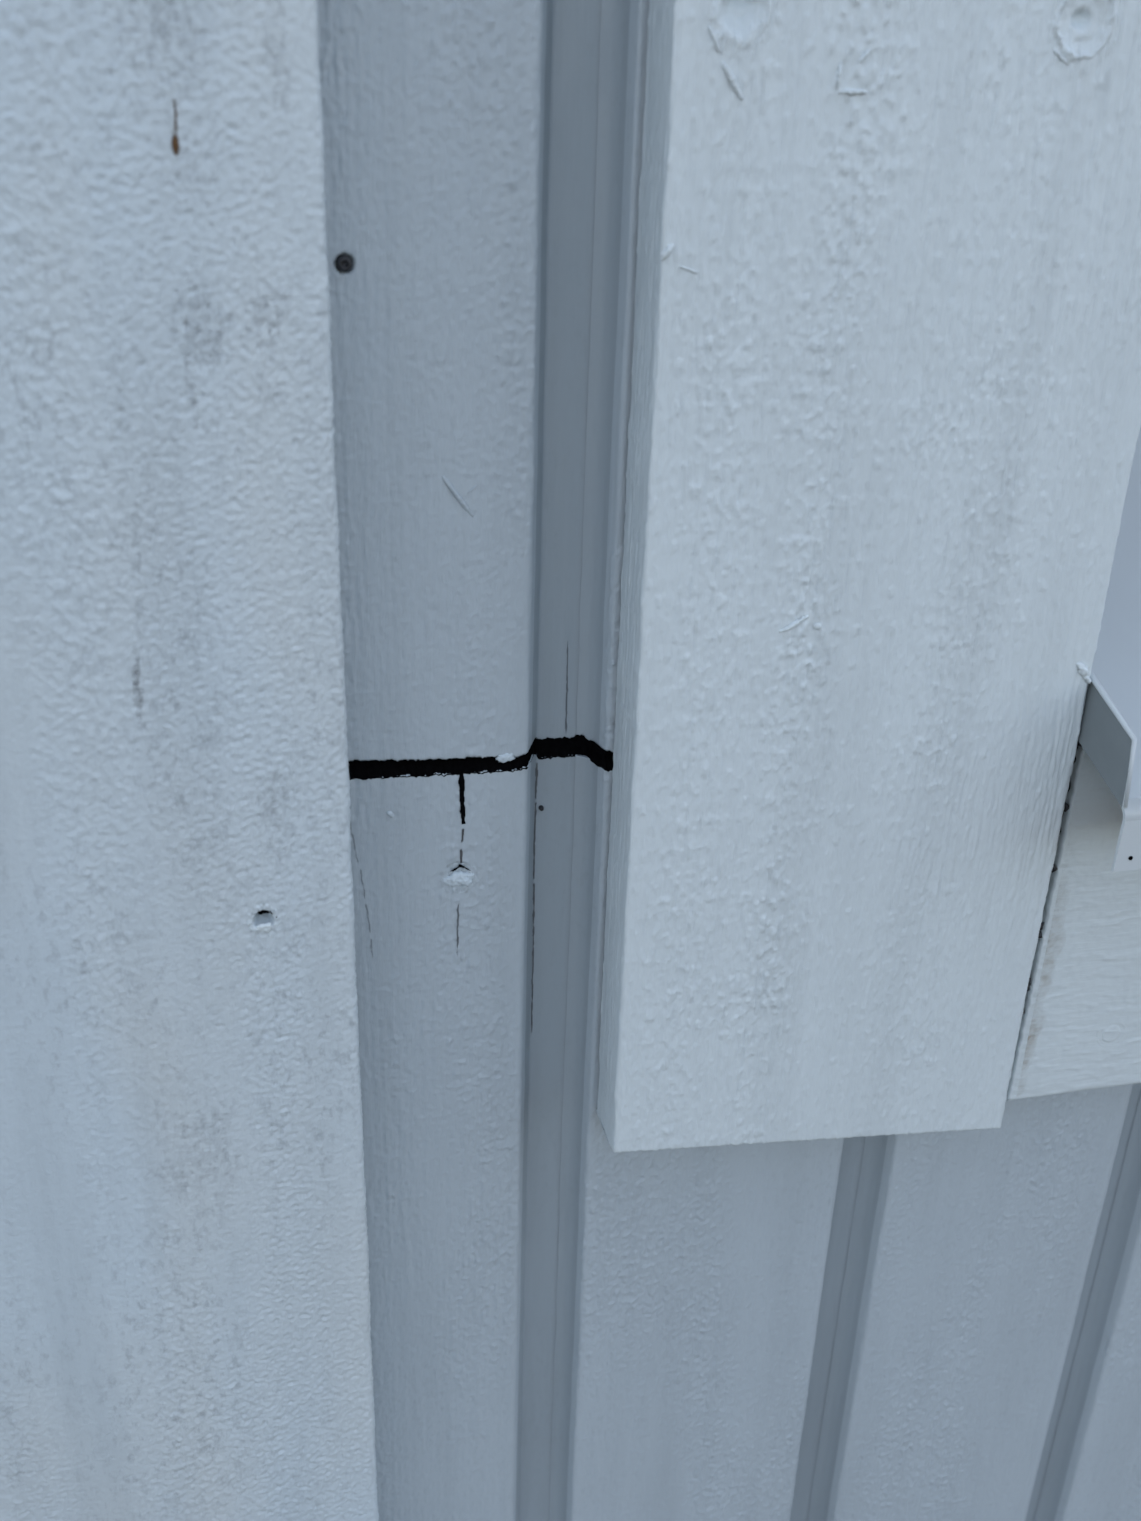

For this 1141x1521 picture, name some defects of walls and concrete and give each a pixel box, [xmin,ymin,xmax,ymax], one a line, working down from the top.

crack [348,646,613,1031]